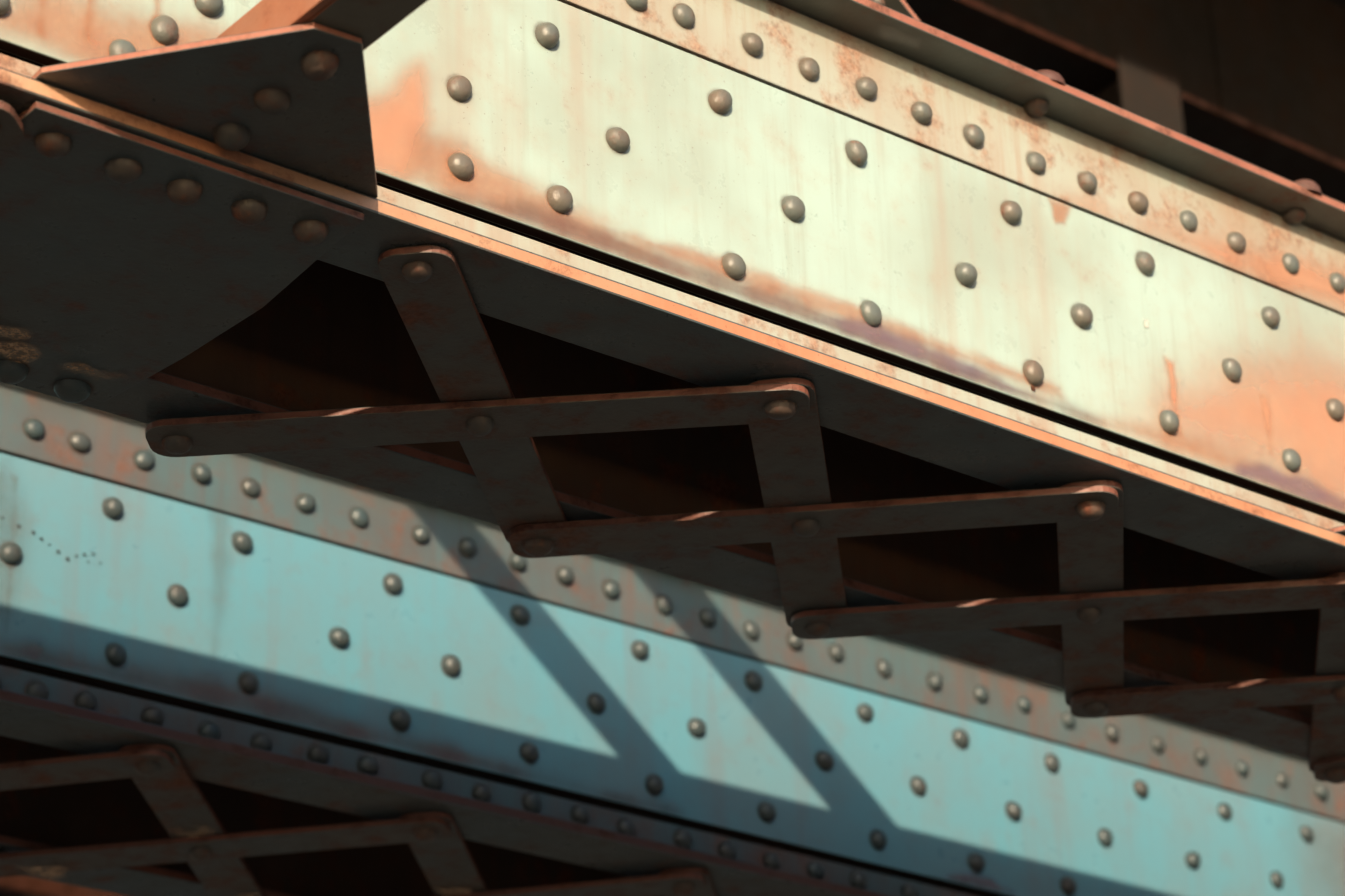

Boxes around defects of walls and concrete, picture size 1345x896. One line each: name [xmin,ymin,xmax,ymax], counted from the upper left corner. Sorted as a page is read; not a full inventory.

corrosion [744,284,815,317]
corrosion [1266,262,1345,301]
corrosion [1167,361,1345,494]